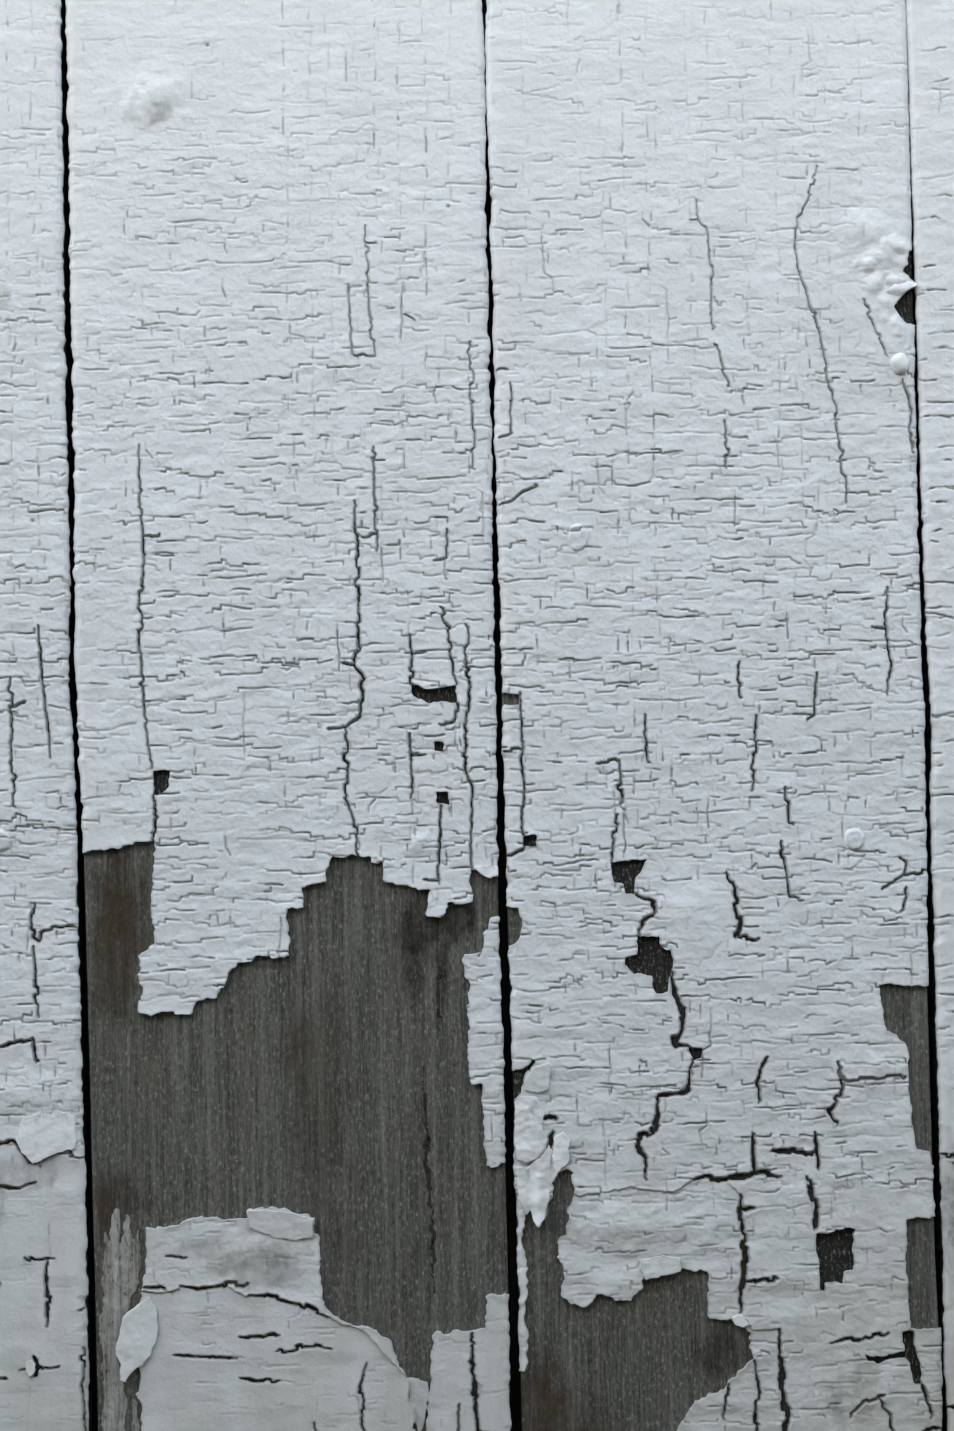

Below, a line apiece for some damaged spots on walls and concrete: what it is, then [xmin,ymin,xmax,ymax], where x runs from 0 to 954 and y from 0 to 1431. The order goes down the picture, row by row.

crack [343,448,378,832]
crack [409,610,473,882]
crack [0,907,71,1062]
crack [149,1256,330,1383]
peeling [84,841,753,1431]
peeling [523,835,537,846]
crack [635,965,691,1173]
crack [726,873,757,942]
crack [724,1331,790,1431]
crack [693,1058,844,1312]
peeling [816,1228,854,1291]
peeling [879,983,932,1160]